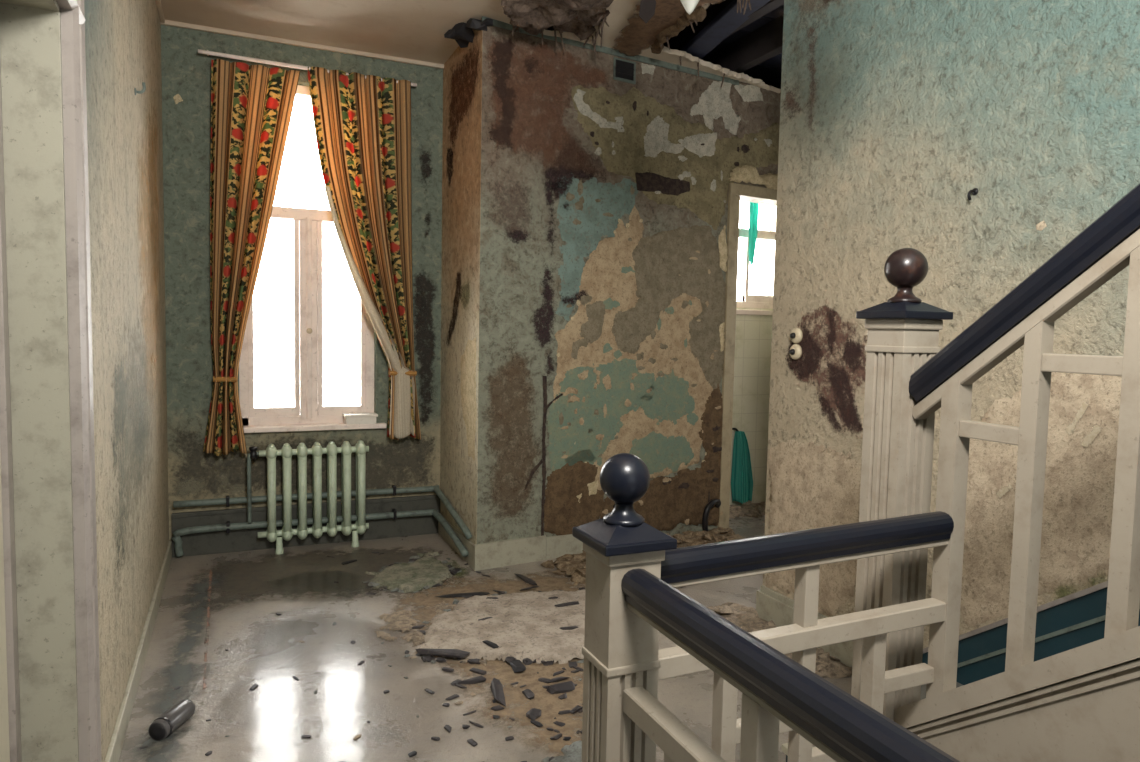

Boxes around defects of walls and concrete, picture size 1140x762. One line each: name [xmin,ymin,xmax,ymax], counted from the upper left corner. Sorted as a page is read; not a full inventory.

flaking render [641,6,707,75]
damp [485,37,608,255]
damp [532,269,588,385]
flaking render [553,81,779,503]
damp [486,349,539,520]